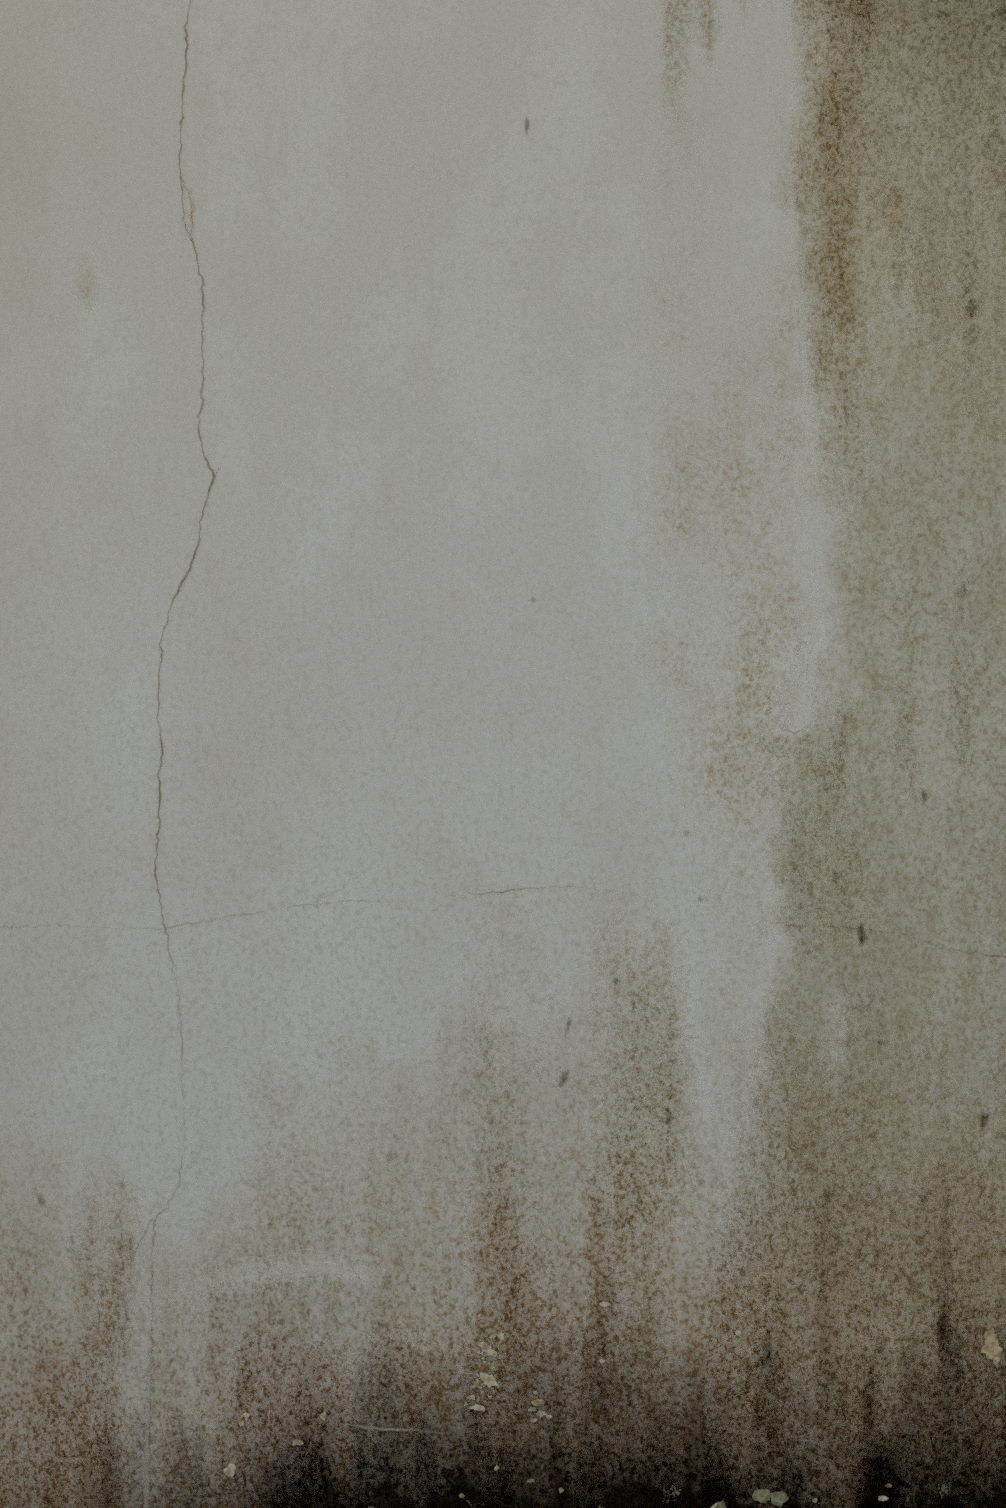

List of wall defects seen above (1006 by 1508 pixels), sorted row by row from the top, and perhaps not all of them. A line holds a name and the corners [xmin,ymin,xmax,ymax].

water stain [0,1266,1006,1508]
flaking render [752,1489,789,1507]